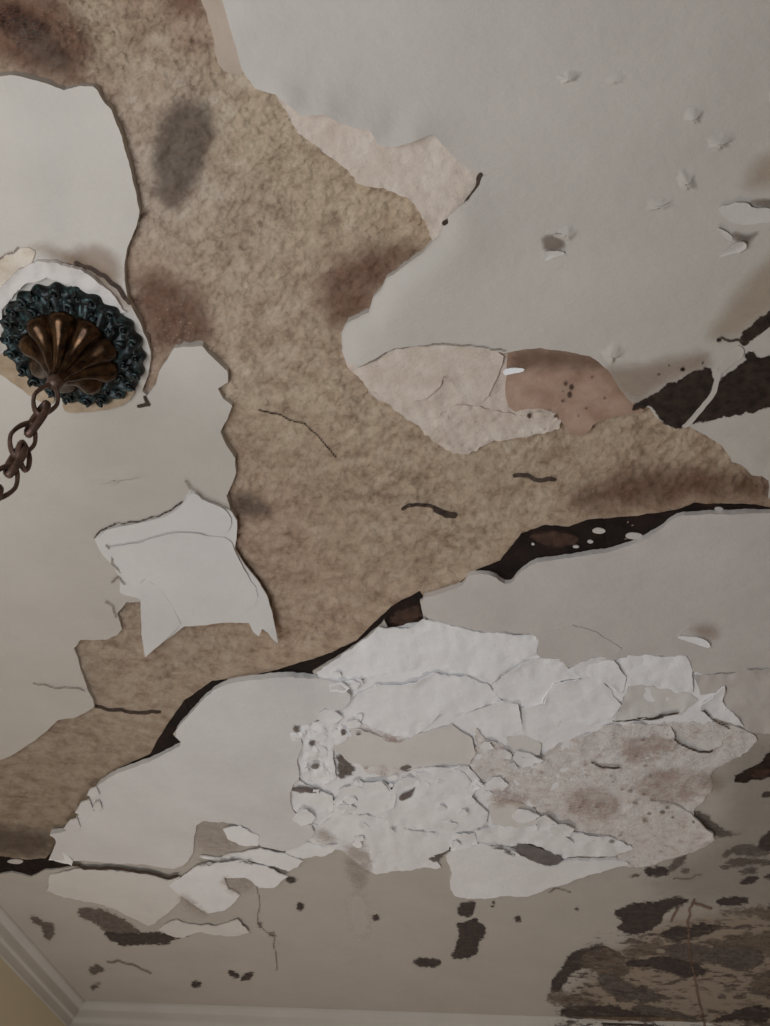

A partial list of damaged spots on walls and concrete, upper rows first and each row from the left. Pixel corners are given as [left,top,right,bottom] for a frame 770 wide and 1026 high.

spalling [0,247,131,320]
flaking render [346,344,561,455]
peeling [632,345,770,429]
flaking render [94,481,278,657]
flaking render [421,509,770,674]
peeling [47,619,770,926]
water stain [734,753,770,783]
crack [72,863,178,880]
water stain [31,917,55,940]
water stain [78,908,187,946]
water stain [414,901,486,968]
water stain [547,831,770,1026]